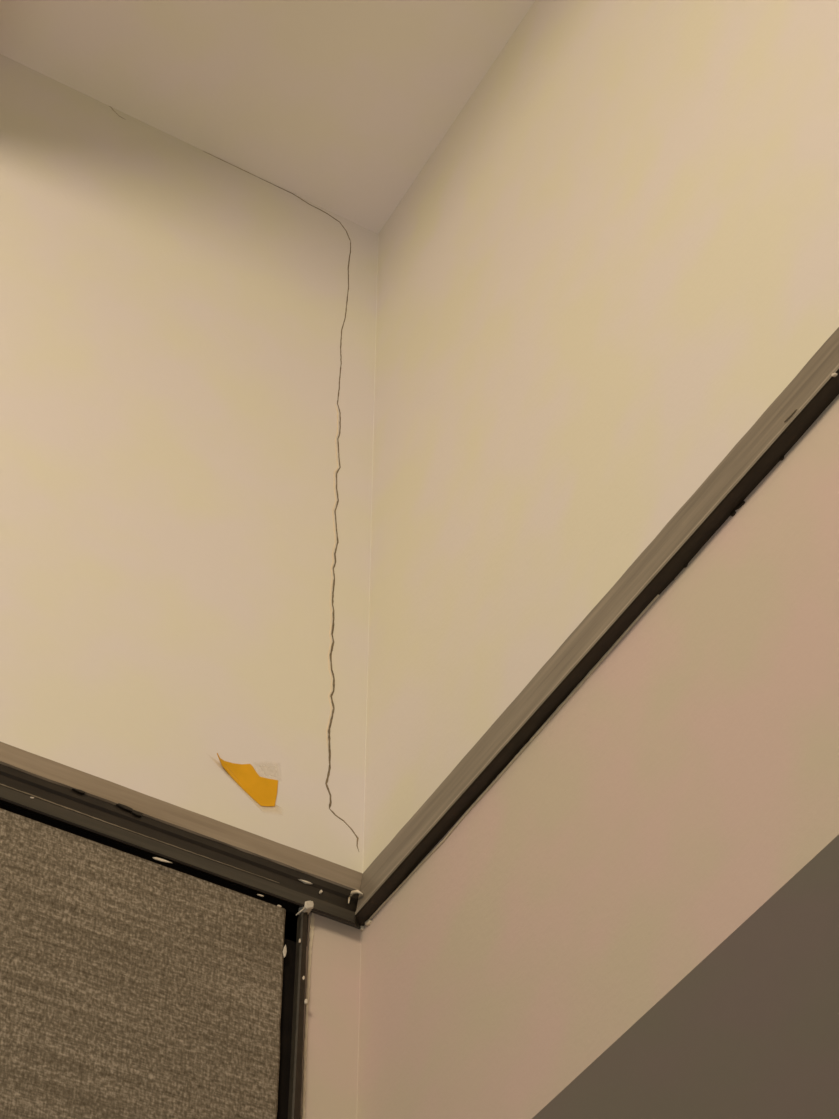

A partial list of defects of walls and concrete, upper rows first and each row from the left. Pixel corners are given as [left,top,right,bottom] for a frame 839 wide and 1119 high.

crack [204,151,359,851]